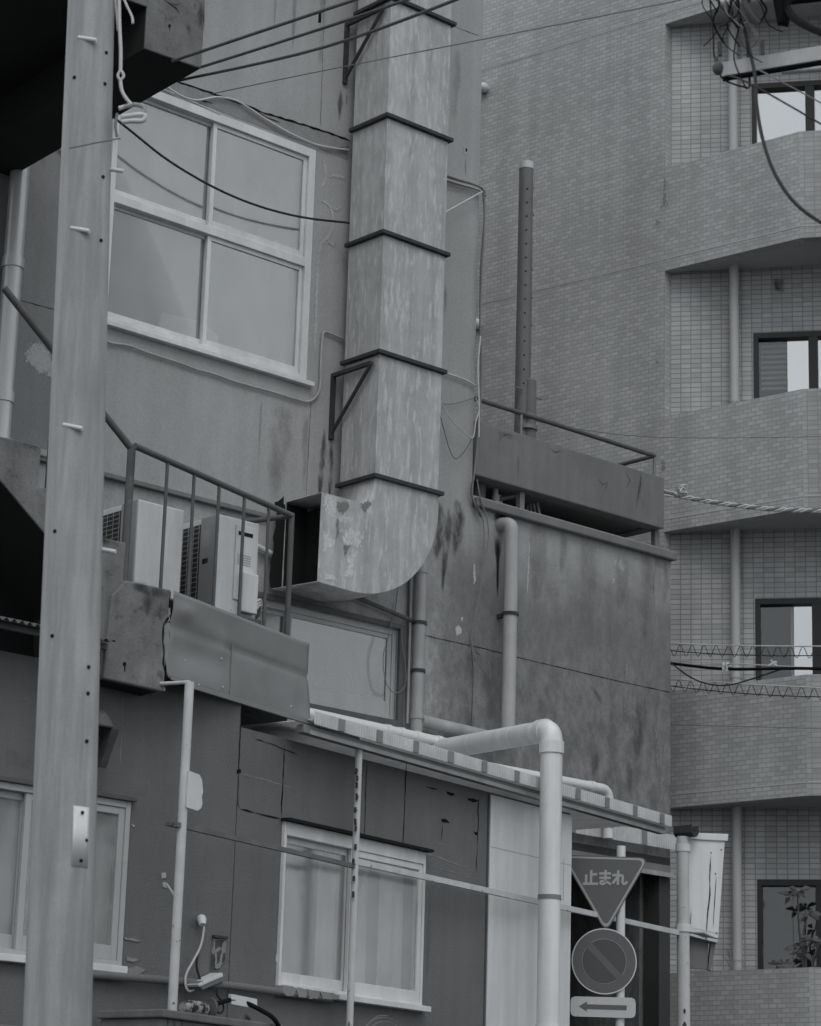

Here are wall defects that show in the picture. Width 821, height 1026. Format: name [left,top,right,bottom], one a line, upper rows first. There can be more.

peeling [323,490,374,581]
crack [162,593,171,680]